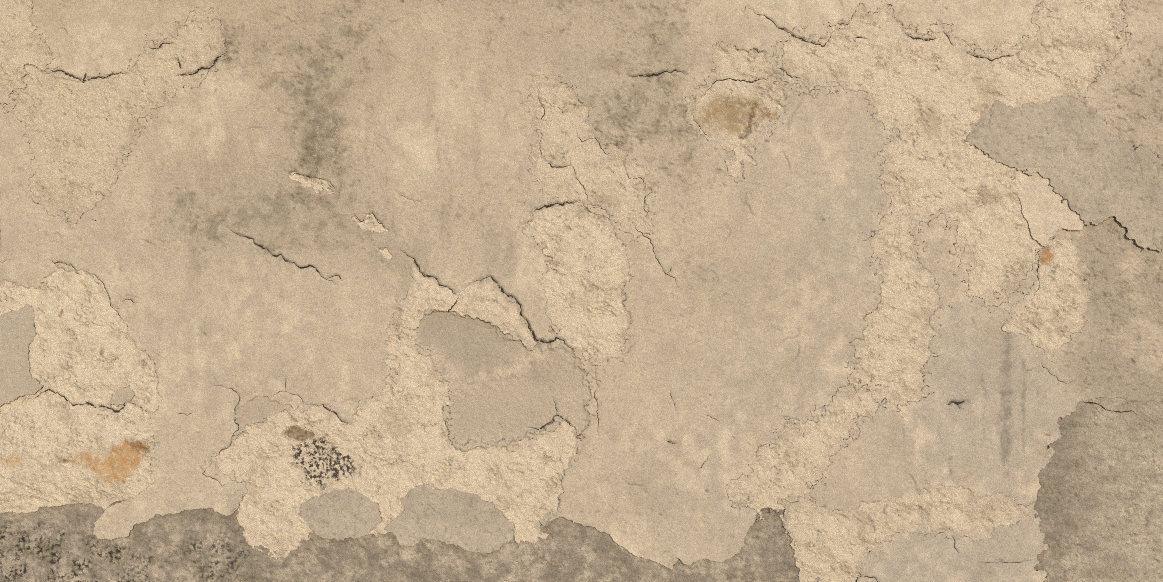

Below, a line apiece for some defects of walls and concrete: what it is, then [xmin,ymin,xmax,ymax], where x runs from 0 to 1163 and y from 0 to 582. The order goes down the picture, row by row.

crack [629,69,684,77]
crack [742,7,866,47]
crack [905,32,1018,62]
flaking render [0,0,229,225]
corrosion [705,100,777,131]
crack [692,69,798,137]
crack [231,230,341,282]
flaking render [684,0,1163,582]
flaking render [0,266,162,412]
flaking render [93,72,757,570]
corrosion [81,442,142,480]